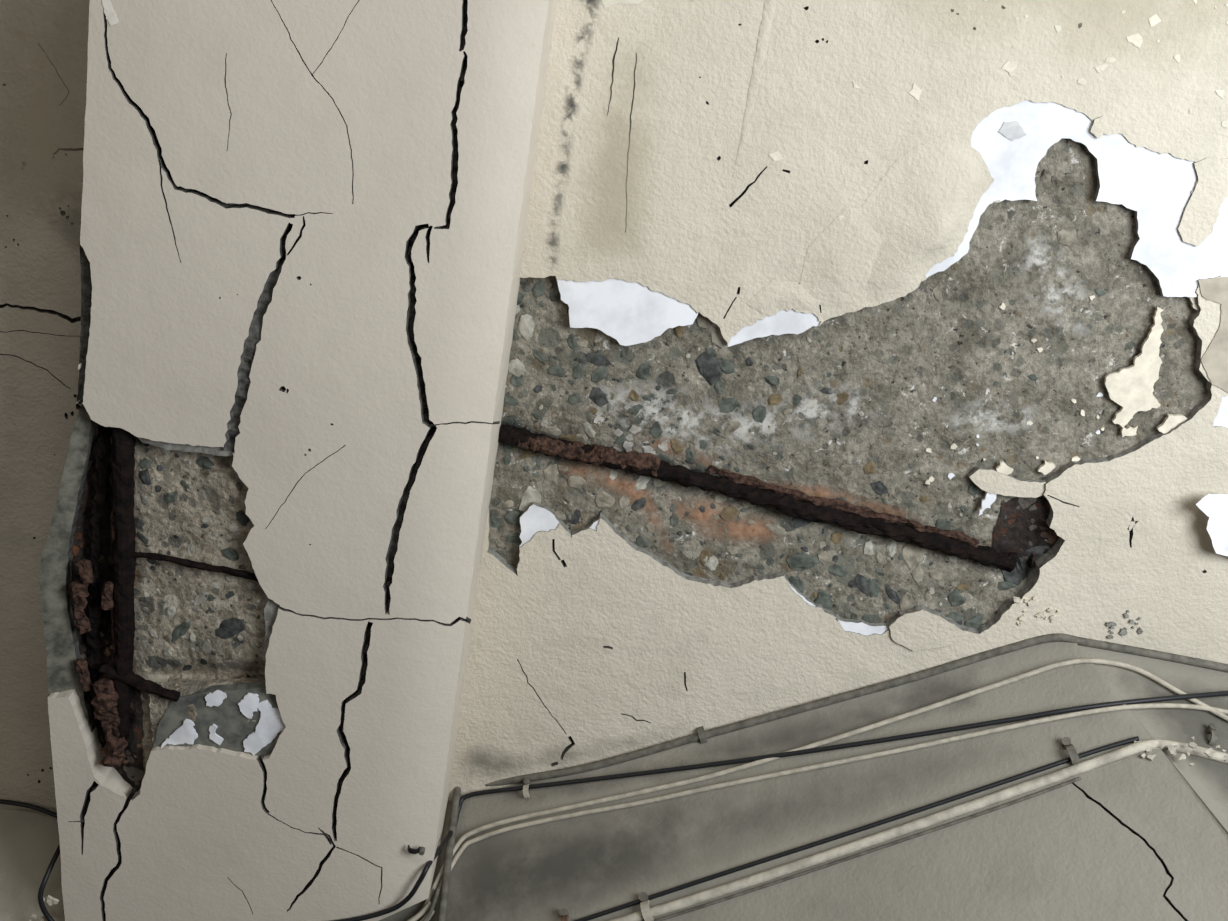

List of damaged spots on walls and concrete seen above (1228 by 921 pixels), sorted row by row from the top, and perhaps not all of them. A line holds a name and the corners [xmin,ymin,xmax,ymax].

crack [53,147,84,155]
crack [103,0,359,453]
crack [0,303,81,389]
spalling [489,100,1228,651]
spalling [33,245,114,748]
crack [257,0,500,912]
rust [680,504,771,539]
rust [785,486,897,514]
spalling [113,436,286,792]
crack [69,781,136,921]
crack [1072,783,1188,921]